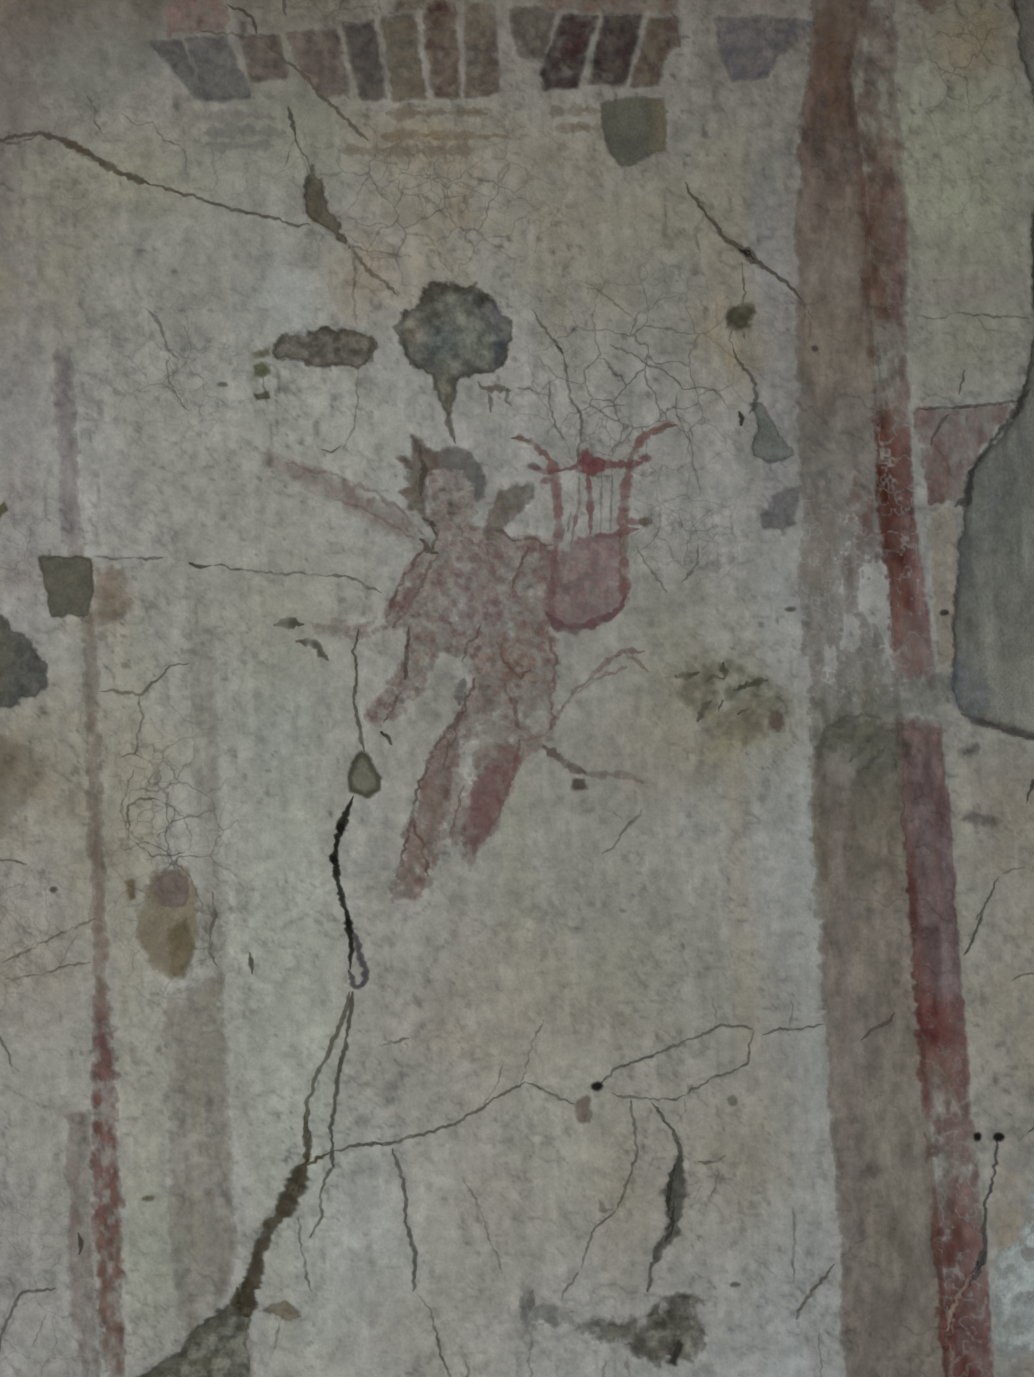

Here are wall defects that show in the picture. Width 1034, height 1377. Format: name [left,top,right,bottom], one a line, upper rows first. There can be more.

flaking render [1014,0,1034,95]
crack [0,131,303,227]
crack [685,182,802,300]
flaking render [272,325,377,369]
flaking render [393,282,512,444]
crack [733,349,758,426]
flaking render [951,340,1034,739]
crack [230,796,574,1317]
flaking render [140,1284,299,1377]
crack [586,1024,820,1292]
crack [946,1141,998,1332]
damp [992,1194,1034,1354]